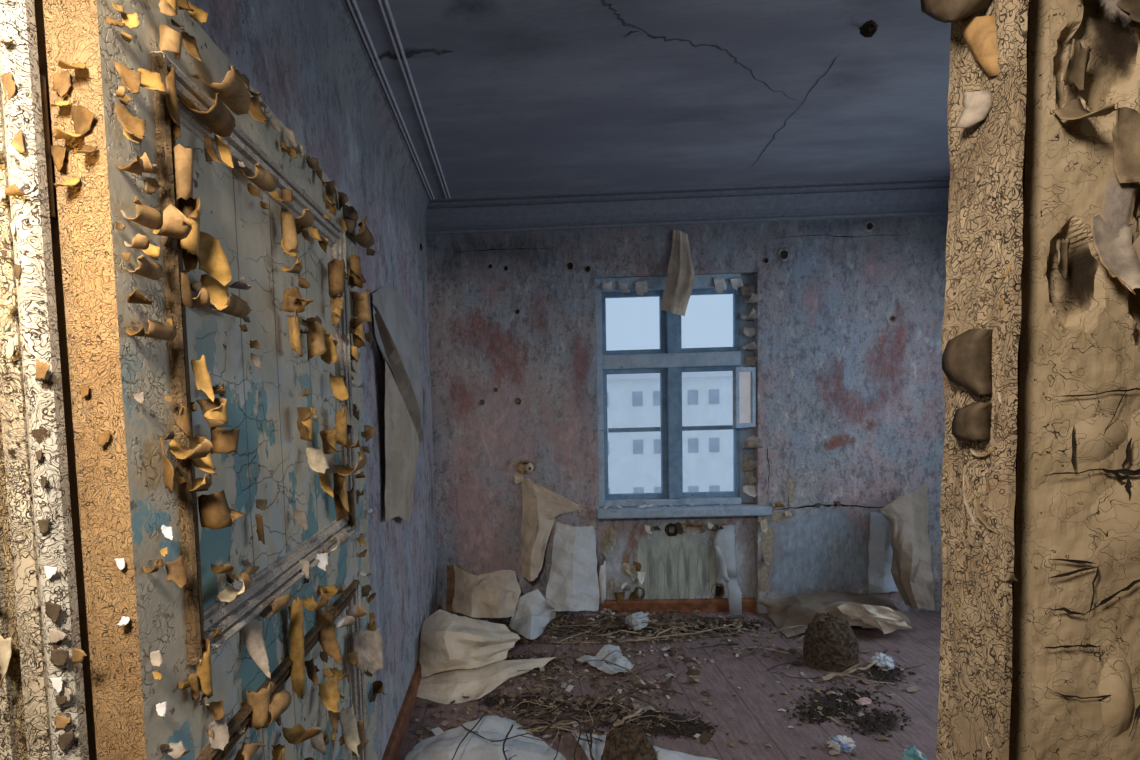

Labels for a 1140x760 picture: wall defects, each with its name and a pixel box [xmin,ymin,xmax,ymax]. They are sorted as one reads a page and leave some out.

peeling [106,1,140,43]
crack [601,0,839,167]
peeling [920,0,999,128]
peeling [1052,39,1140,295]
peeling [113,0,386,760]
crack [1045,388,1140,500]
peeling [44,565,58,579]
crack [1048,559,1140,616]
peeling [0,635,12,687]
peeling [45,602,87,751]
crack [1042,644,1101,661]
crack [1046,687,1112,699]